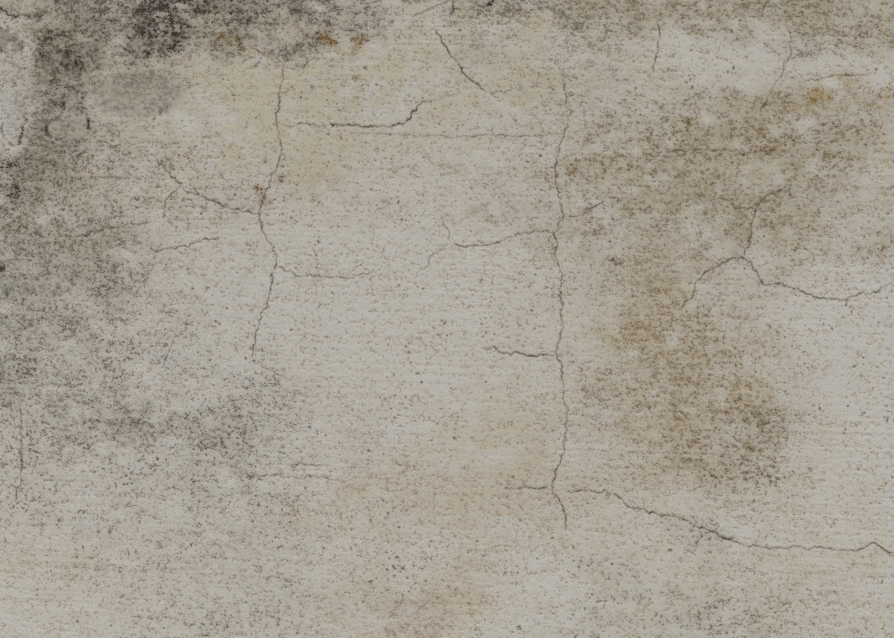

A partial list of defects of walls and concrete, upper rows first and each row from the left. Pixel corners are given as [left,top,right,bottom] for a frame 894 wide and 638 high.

water stain [32,0,84,154]
water stain [123,0,257,58]
crack [436,31,484,90]
crack [84,50,426,375]
crack [485,84,777,549]
water stain [590,255,795,494]
crack [679,189,887,309]